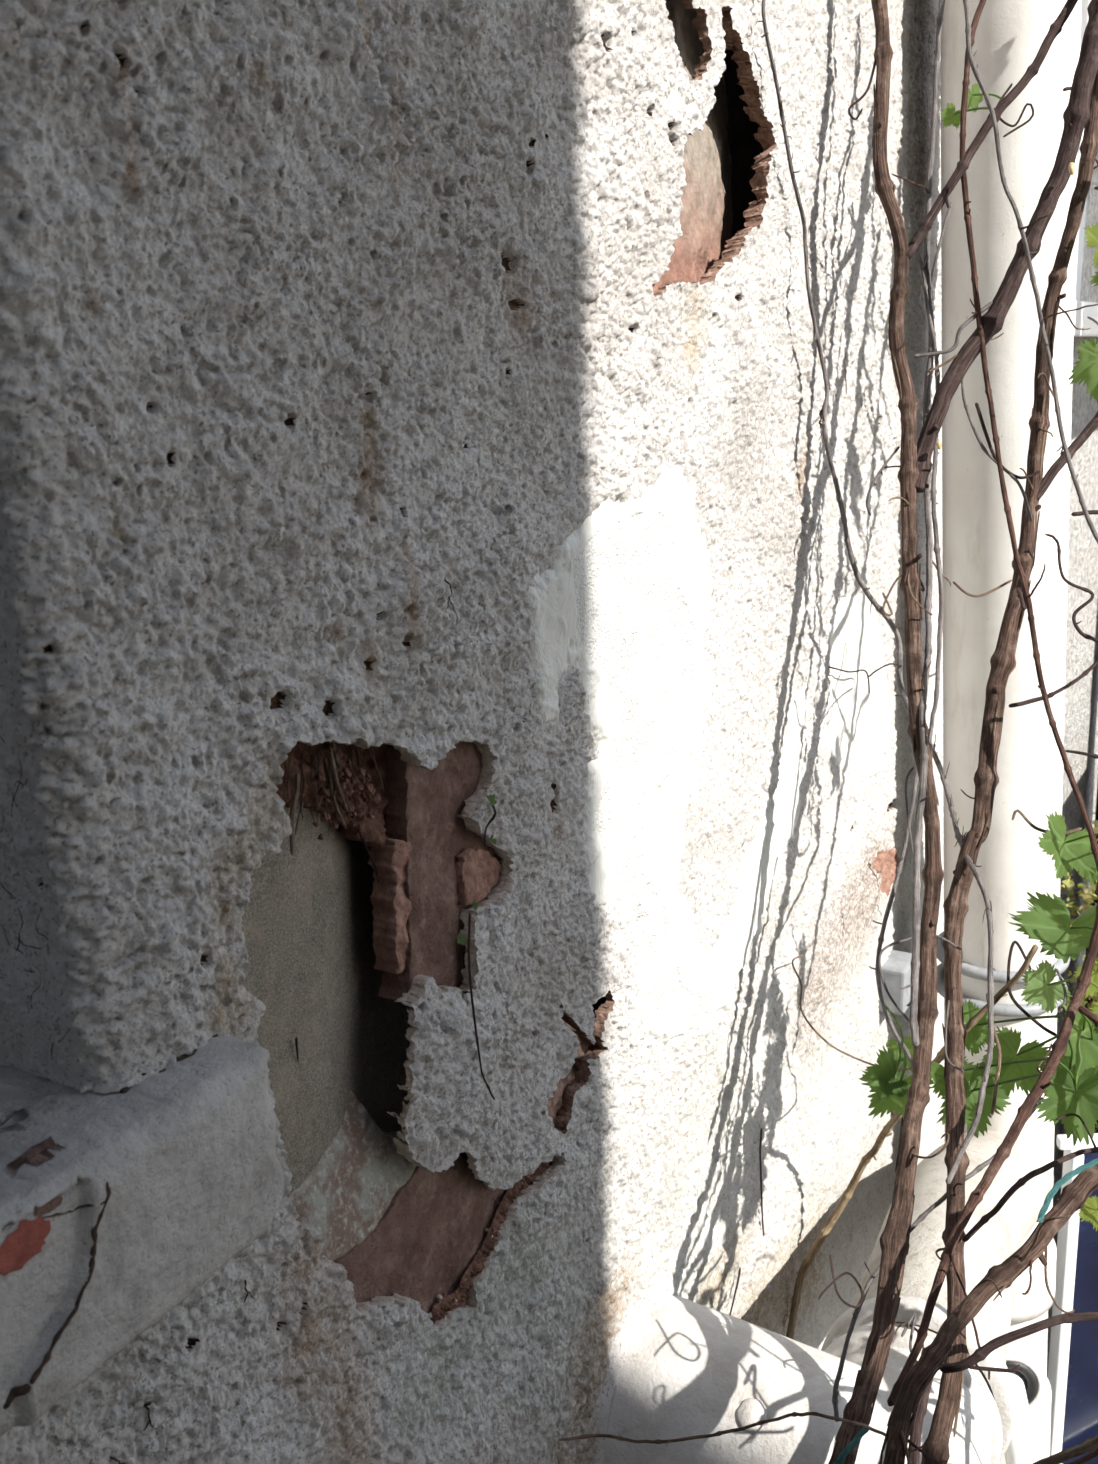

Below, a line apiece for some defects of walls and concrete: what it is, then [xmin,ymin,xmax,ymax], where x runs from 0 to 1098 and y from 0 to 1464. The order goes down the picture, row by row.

spalling [652,0,777,297]
peeling [0,1106,30,1133]
peeling [7,1136,66,1174]
spalling [241,738,566,1331]
crack [547,990,615,1134]
peeling [0,1193,63,1277]
crack [3,1181,111,1409]